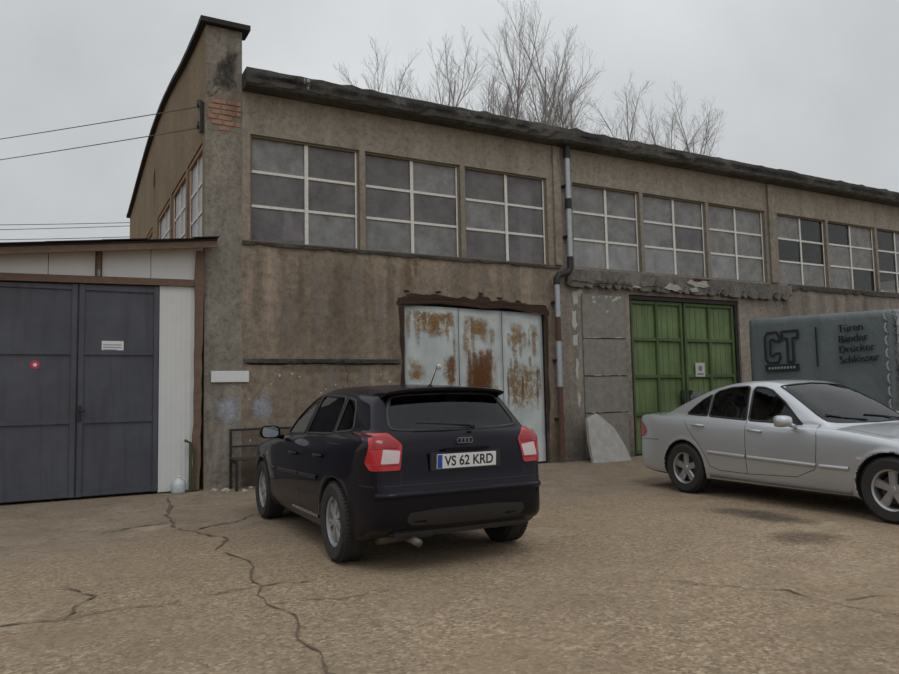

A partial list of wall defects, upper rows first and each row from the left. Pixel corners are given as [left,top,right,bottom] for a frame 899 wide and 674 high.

flaking render [207,86,242,135]
rust [406,312,496,389]
rust [507,326,541,404]
peeling [571,289,621,346]
spalling [665,278,709,292]
crack [0,497,403,674]